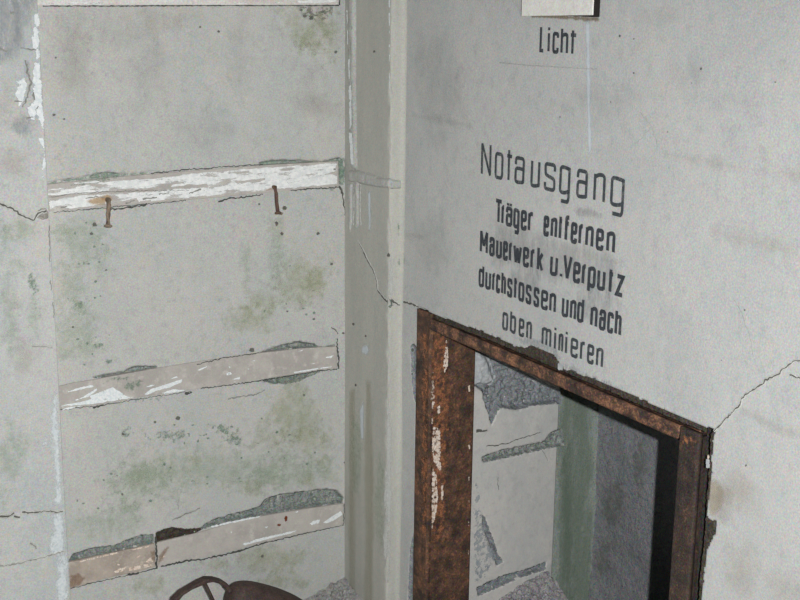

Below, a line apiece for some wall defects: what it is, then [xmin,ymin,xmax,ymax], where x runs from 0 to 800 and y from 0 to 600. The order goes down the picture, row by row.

peeling [15,13,353,219]
crack [0,164,263,261]
crack [291,168,419,309]
flaking render [43,366,343,600]
flaking render [265,341,318,351]
flaking render [264,345,334,385]
corrosion [421,332,449,540]
flaking render [427,310,716,600]
crack [713,359,800,432]